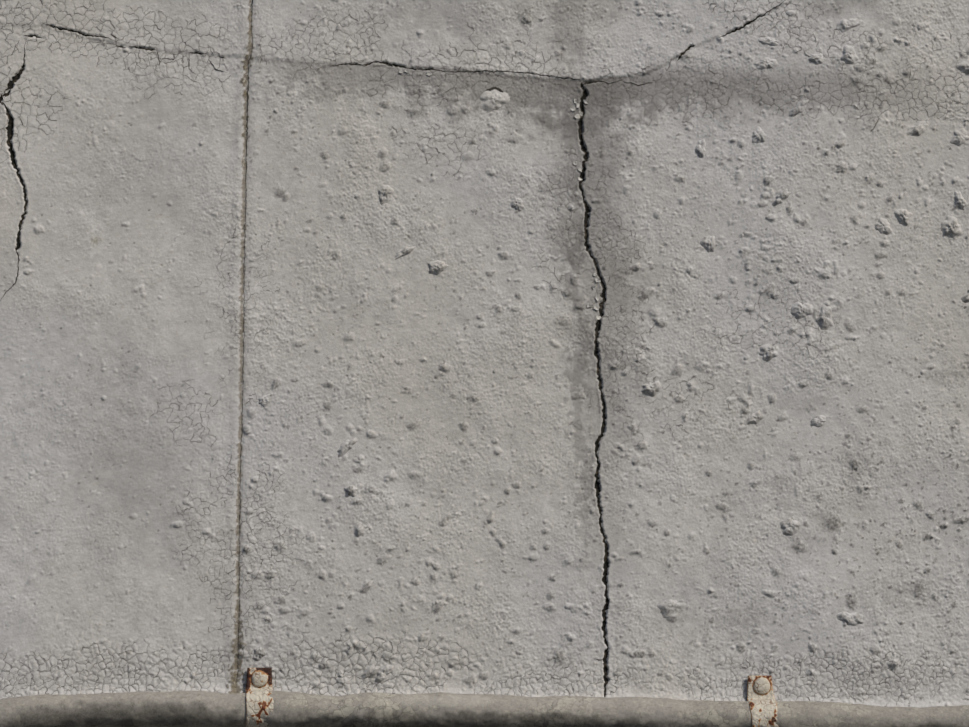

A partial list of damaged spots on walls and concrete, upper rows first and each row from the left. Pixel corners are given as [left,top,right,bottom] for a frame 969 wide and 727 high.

crack [0,212,303,698]
crack [250,0,969,706]